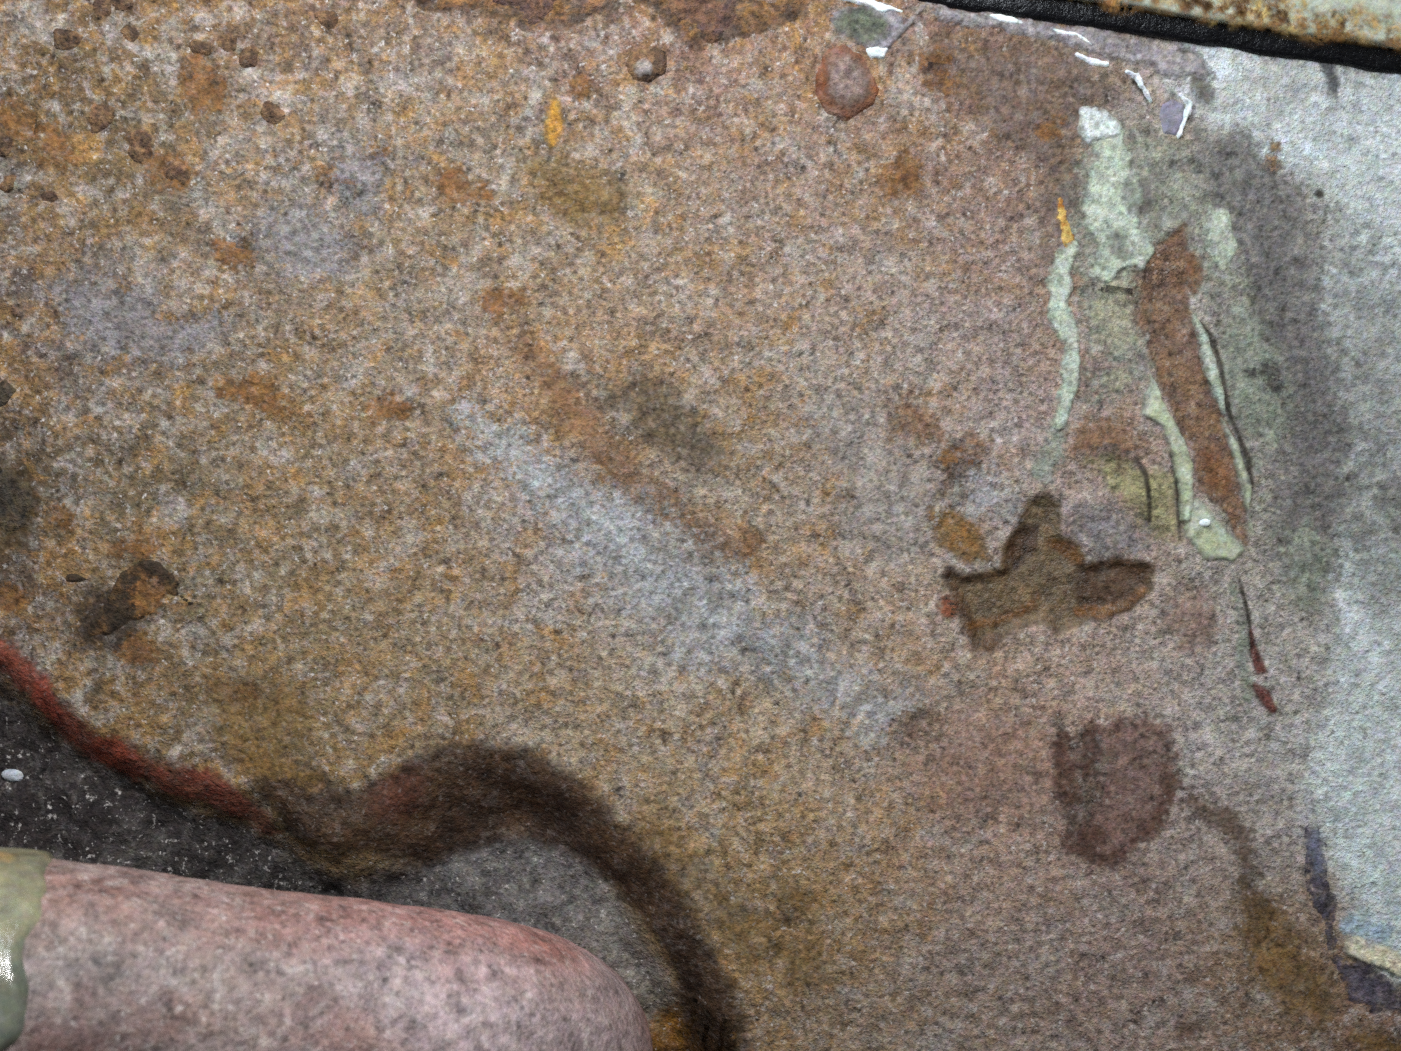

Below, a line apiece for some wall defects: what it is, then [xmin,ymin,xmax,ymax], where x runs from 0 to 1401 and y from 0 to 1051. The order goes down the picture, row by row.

rust [53,28,83,50]
rust [86,0,140,42]
rust [416,0,811,50]
rust [1105,0,1401,47]
rust [176,33,259,119]
rust [260,100,286,125]
rust [123,129,198,191]
peeling [831,0,1307,653]
leakage [794,385,1022,564]
leakage [1063,502,1152,561]
rust [65,534,194,667]
leakage [226,740,746,1051]